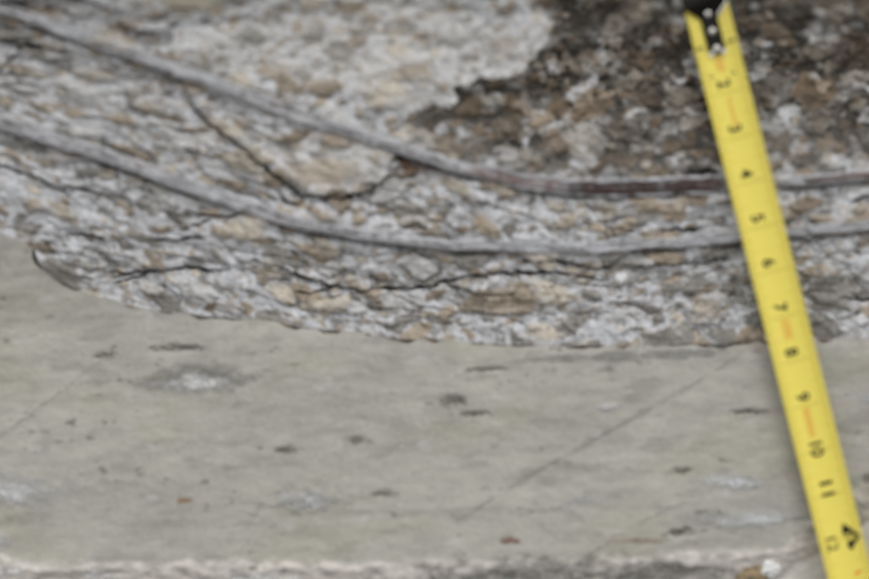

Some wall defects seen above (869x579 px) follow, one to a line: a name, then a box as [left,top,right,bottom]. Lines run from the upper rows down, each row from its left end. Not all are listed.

spalling [0,0,769,349]
corrosion [395,156,436,177]
corrosion [570,177,724,197]
spalling [728,0,869,342]